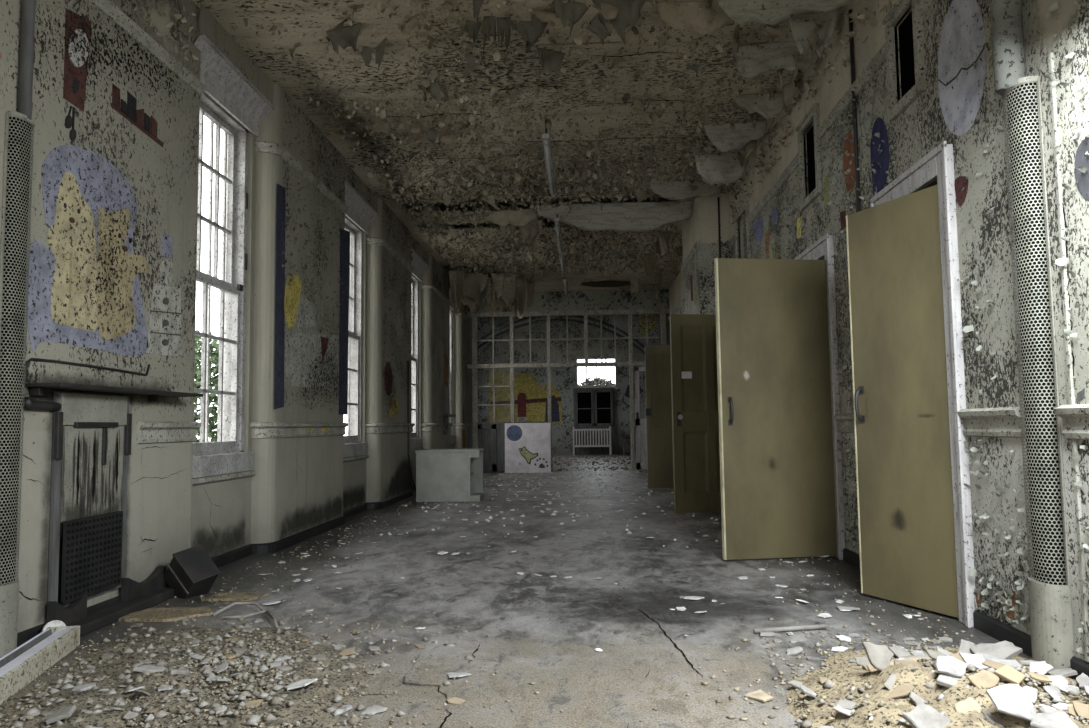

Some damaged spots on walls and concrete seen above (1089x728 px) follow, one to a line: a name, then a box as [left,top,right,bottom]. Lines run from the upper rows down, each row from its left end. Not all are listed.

peeling [1045,0,1089,58]
peeling [243,0,893,319]
peeling [1063,118,1089,190]
peeling [748,58,920,411]
peeling [959,241,1008,358]
peeling [1055,257,1085,344]
leakage [62,425,126,515]
peeling [838,432,859,550]
peeling [963,438,1031,629]
crack [638,609,703,678]
crack [377,665,452,728]